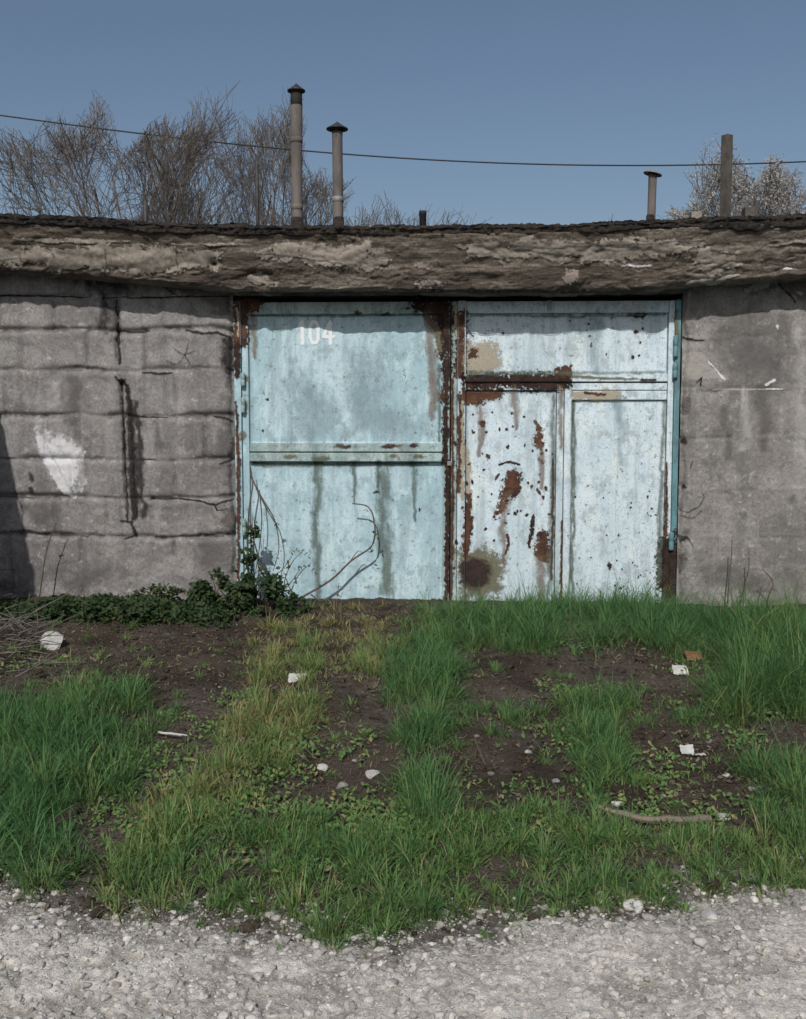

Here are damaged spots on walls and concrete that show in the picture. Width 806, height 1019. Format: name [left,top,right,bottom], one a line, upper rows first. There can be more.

peeling [0,237,393,278]
peeling [247,271,279,287]
peeling [414,262,450,290]
peeling [454,235,806,303]
crack [0,249,726,539]
corrosion [233,297,657,601]
damp [254,458,427,599]
corrosion [653,462,677,604]